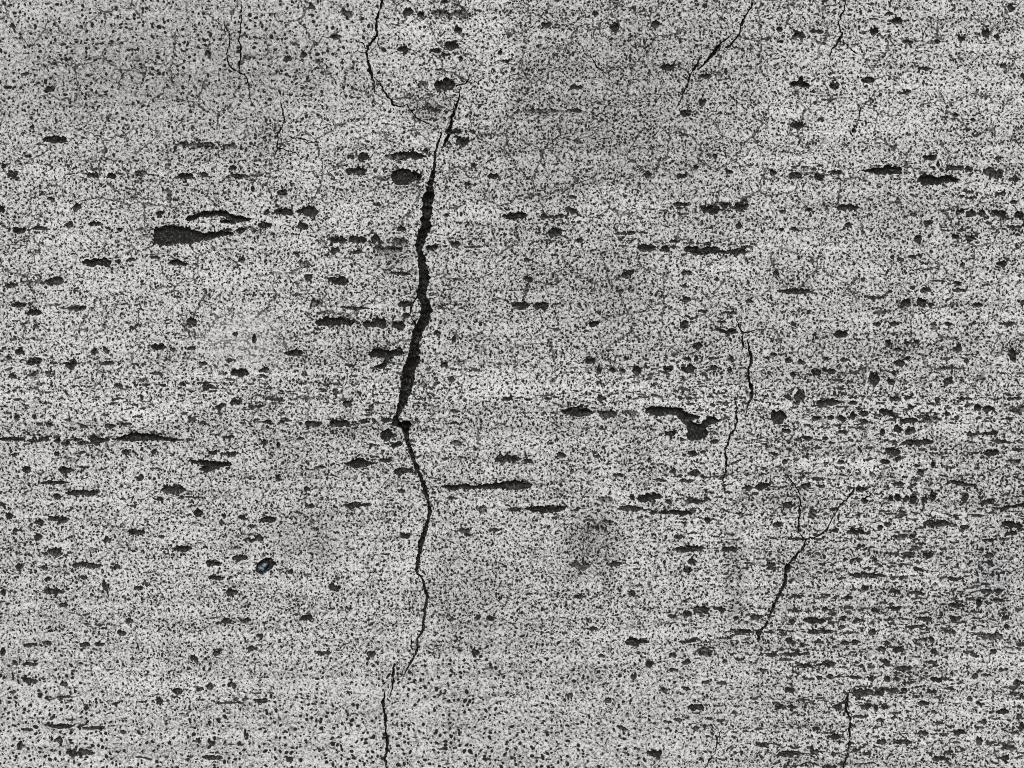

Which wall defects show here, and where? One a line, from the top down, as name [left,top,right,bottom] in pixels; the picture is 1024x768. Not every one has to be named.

crack [676,0,753,108]
crack [353,0,475,768]
crack [722,317,757,494]
crack [756,471,876,642]
crack [842,687,852,768]